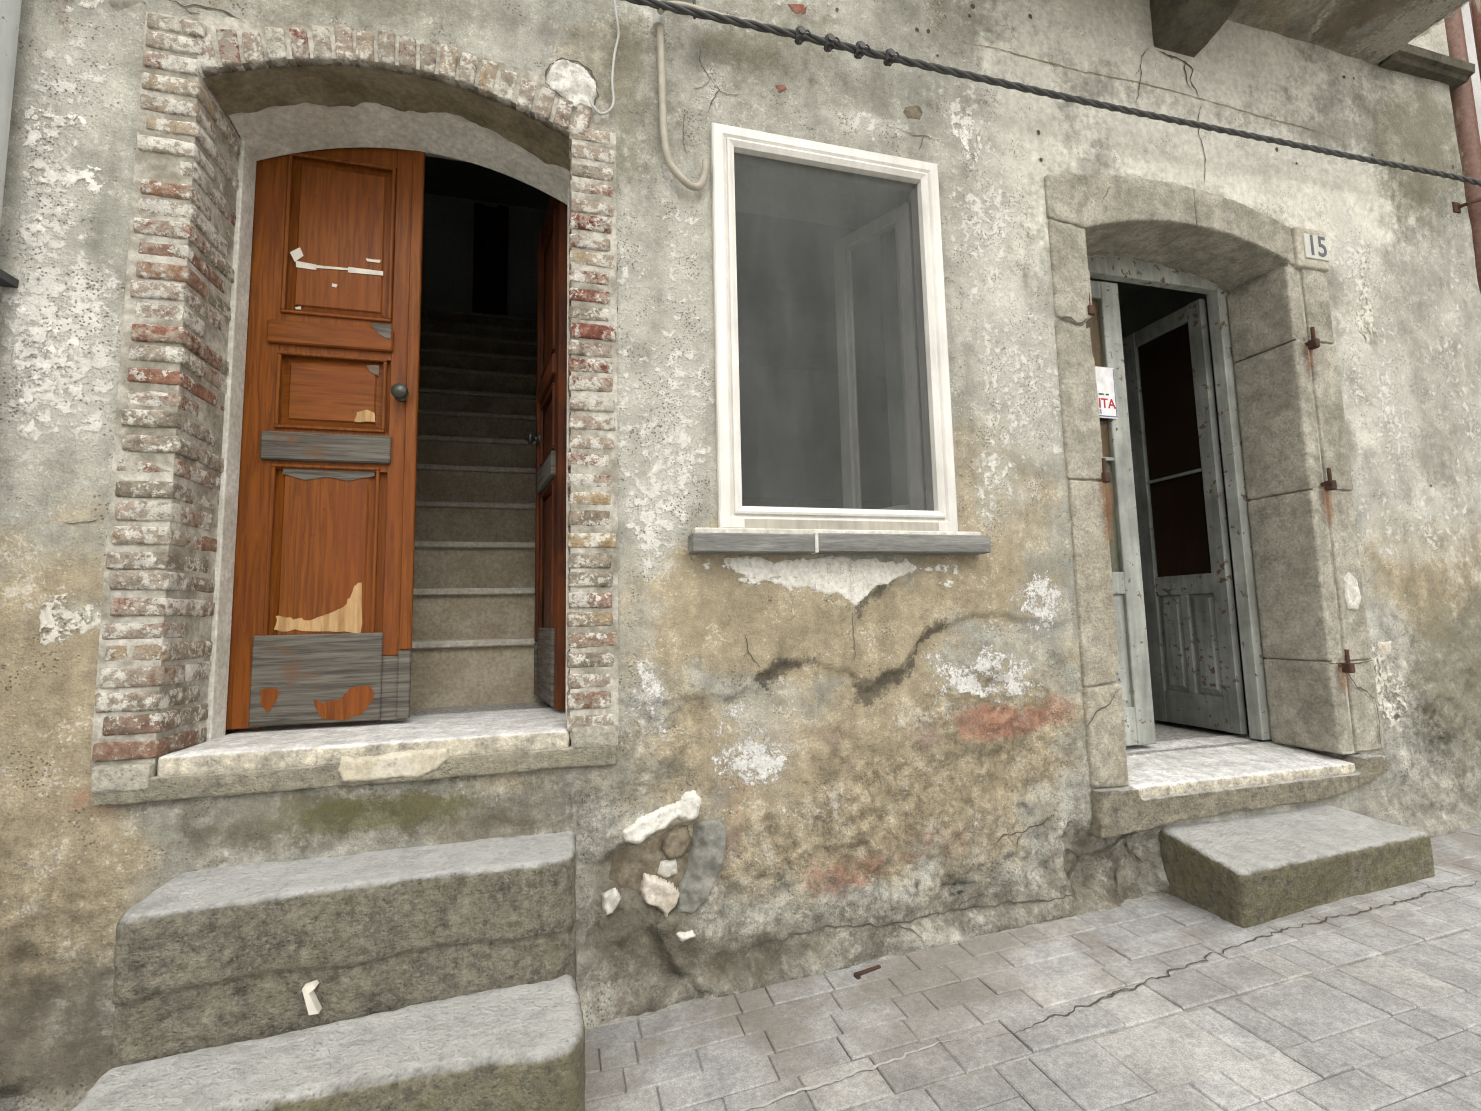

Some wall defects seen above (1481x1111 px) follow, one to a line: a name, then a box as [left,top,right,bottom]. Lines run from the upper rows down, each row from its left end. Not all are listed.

flaking render [65,0,104,12]
flaking render [18,105,106,248]
crack [944,35,1353,183]
flaking render [39,593,102,646]
flaking render [702,554,958,607]
flaking render [601,790,727,942]
crack [746,814,1145,951]